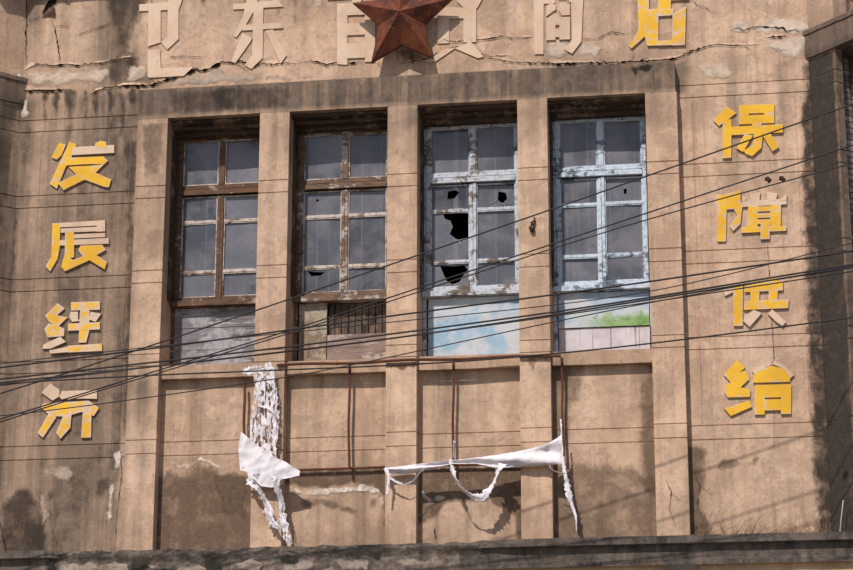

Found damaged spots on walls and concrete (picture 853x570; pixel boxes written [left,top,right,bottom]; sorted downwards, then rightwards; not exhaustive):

crack [23,0,365,95]
crack [396,24,806,66]
peeling [732,18,808,58]
peeling [29,69,109,86]
peeling [128,66,146,81]
water stain [43,92,74,107]
water stain [2,490,52,551]